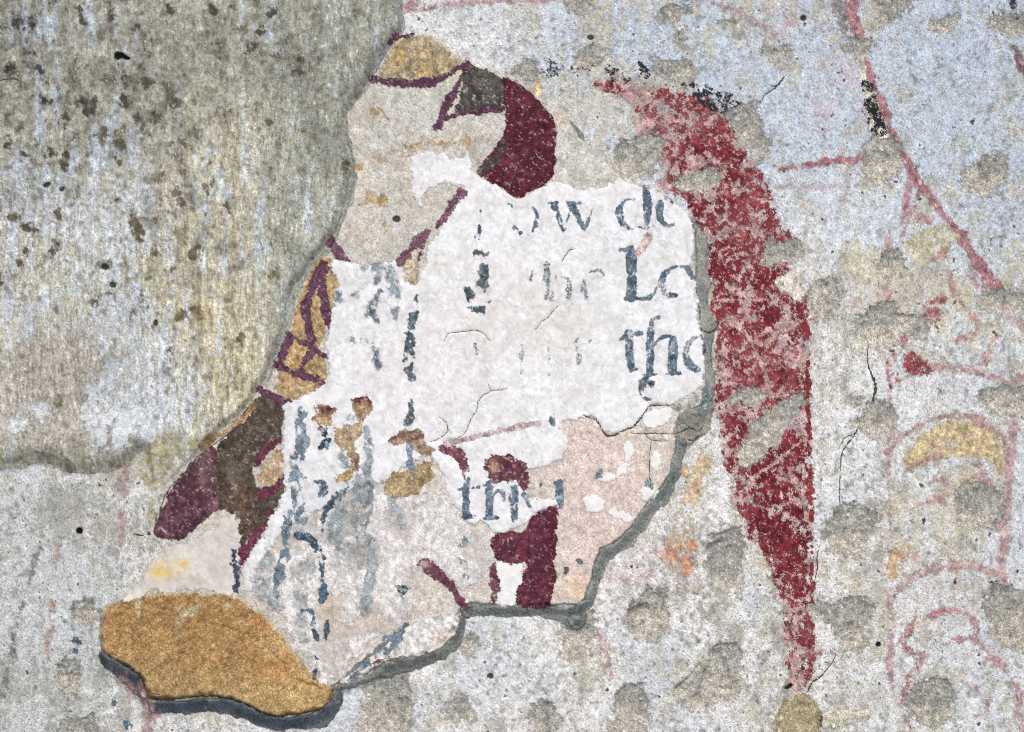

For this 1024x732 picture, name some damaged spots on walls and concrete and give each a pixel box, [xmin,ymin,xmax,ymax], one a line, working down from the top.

mould [58,97,98,129]
mould [119,57,158,137]
damp [6,213,39,233]
damp [128,208,166,255]
damp [174,305,202,321]
crack [837,345,877,502]
peeling [384,428,470,499]
peeling [483,454,530,491]
peeling [496,561,523,607]
flaking render [622,584,670,643]
flaking render [703,523,748,598]
flaking render [671,639,747,713]